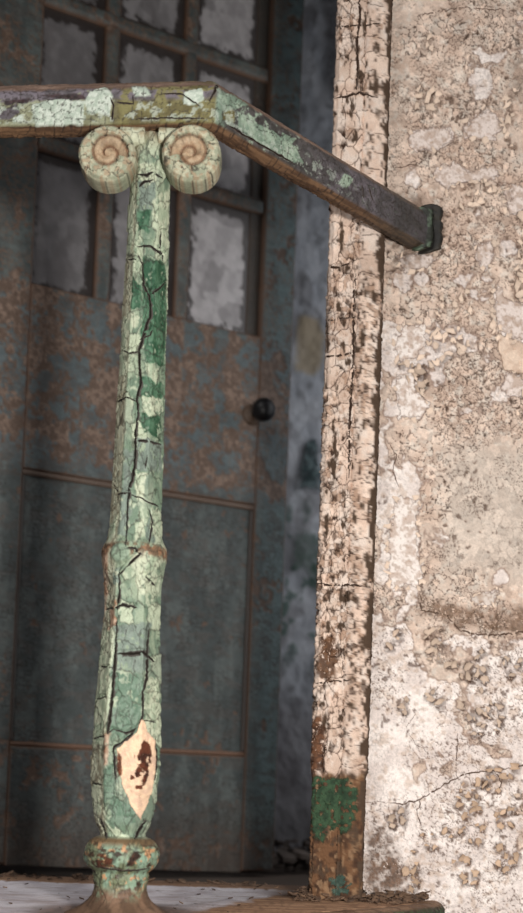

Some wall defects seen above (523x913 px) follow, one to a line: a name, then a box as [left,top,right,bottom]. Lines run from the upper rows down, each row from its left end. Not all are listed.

crack [334,0,380,99]
peeling [408,85,516,153]
peeling [433,161,523,223]
peeling [395,251,438,275]
peeling [488,239,523,345]
crack [326,262,356,474]
peeling [391,289,473,423]
peeling [501,371,523,397]
peeling [383,495,426,592]
peeling [423,627,506,737]
crack [378,734,523,825]
peeling [401,763,520,894]